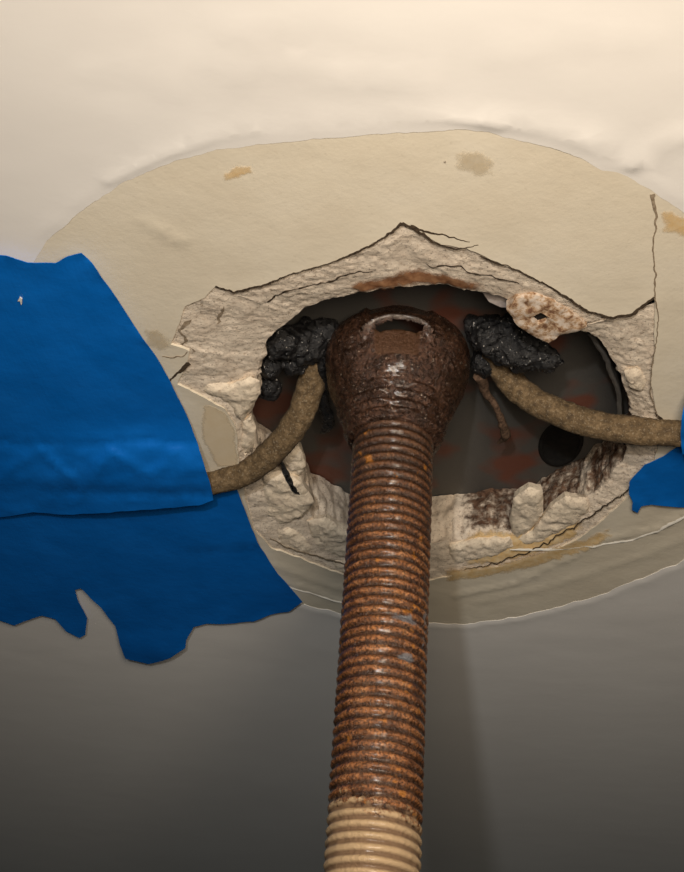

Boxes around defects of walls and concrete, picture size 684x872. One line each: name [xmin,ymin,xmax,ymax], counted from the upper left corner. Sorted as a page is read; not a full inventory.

crack [162,320,195,381]
peeling [34,129,684,472]
rust [353,270,476,291]
crack [215,194,663,420]
flaking render [238,442,350,614]
peeling [428,441,684,624]